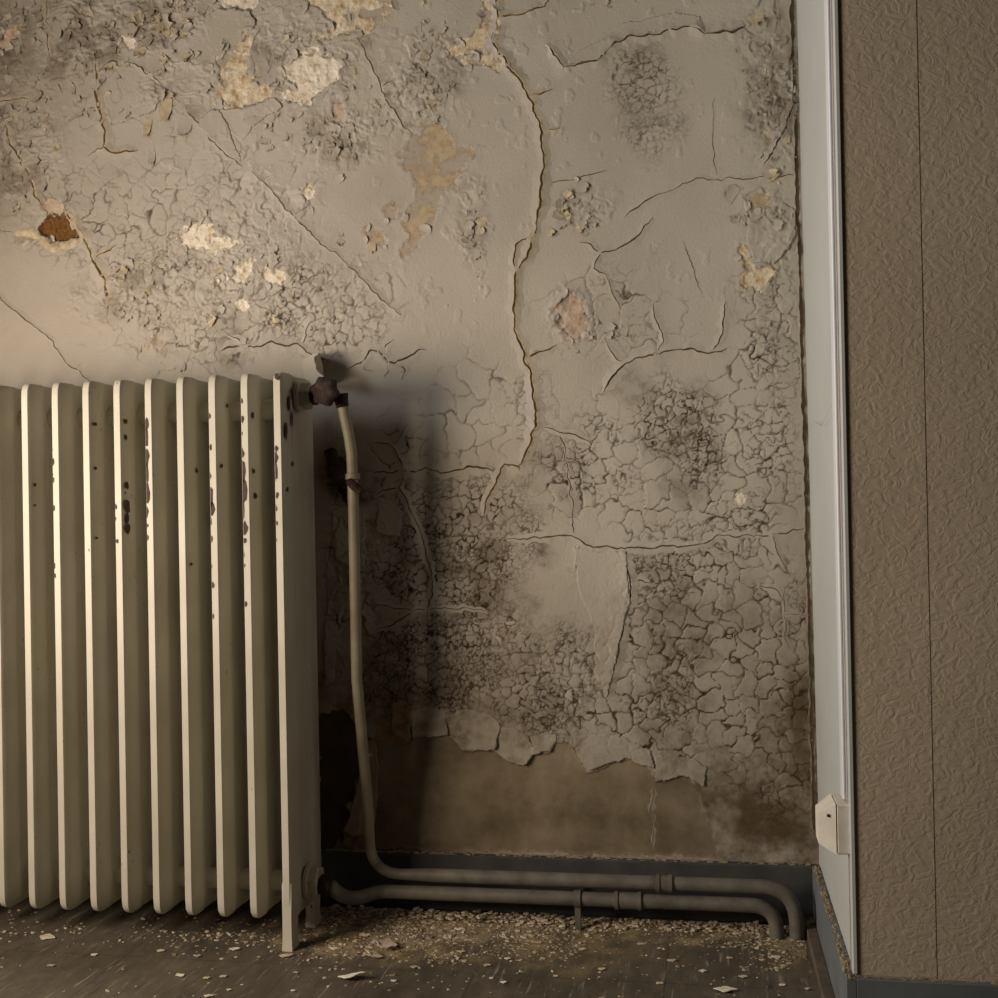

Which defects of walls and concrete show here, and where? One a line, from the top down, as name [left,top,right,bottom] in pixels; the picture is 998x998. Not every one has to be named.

crack [1,94,127,309]
spalling [0,0,399,252]
crack [87,54,427,380]
crack [346,6,412,136]
peeling [361,0,507,260]
peeling [725,0,796,296]
crack [0,293,94,381]
crack [362,0,831,836]
peeling [323,505,367,684]
peeling [573,547,630,690]
peeling [318,707,717,858]
damp [739,795,802,840]